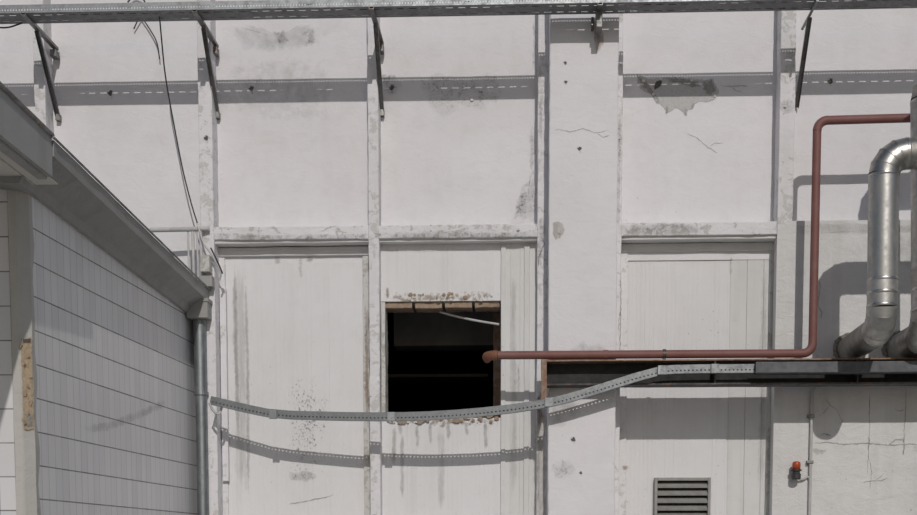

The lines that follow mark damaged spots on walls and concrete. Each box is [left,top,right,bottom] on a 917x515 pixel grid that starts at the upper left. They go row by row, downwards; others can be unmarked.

spalling [637,74,719,116]
spalling [387,289,493,302]
spalling [19,338,34,430]
crack [823,398,910,486]